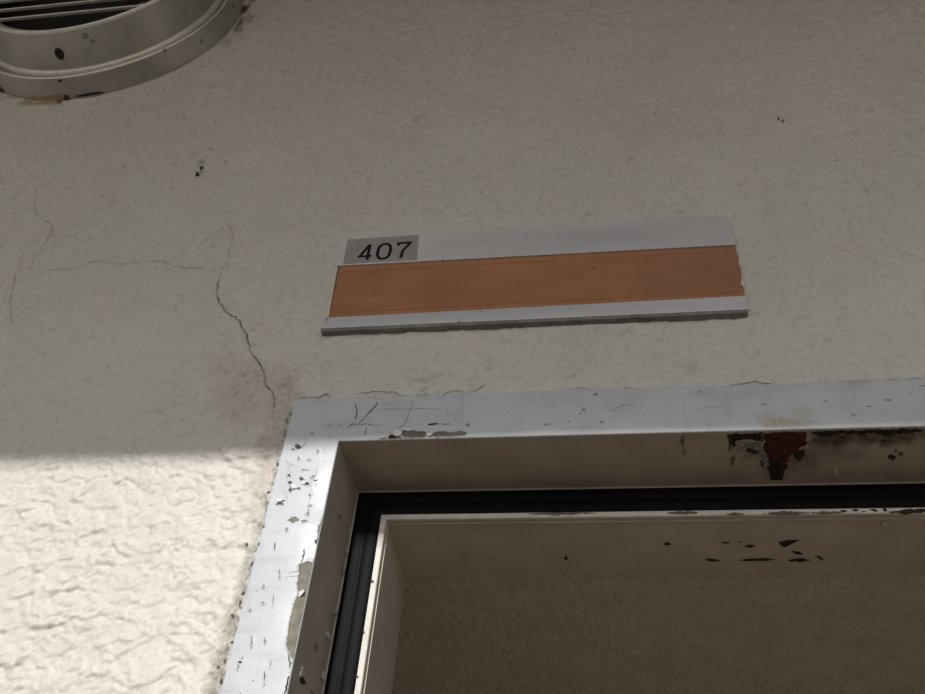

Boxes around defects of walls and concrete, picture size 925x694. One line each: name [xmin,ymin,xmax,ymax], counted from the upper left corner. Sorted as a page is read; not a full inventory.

crack [9,189,275,406]
crack [299,385,486,435]
peeling [377,422,471,439]
rust [727,420,814,481]
peeling [275,432,322,541]
peeling [720,538,826,563]
peeling [277,549,314,694]
peeling [236,634,268,671]